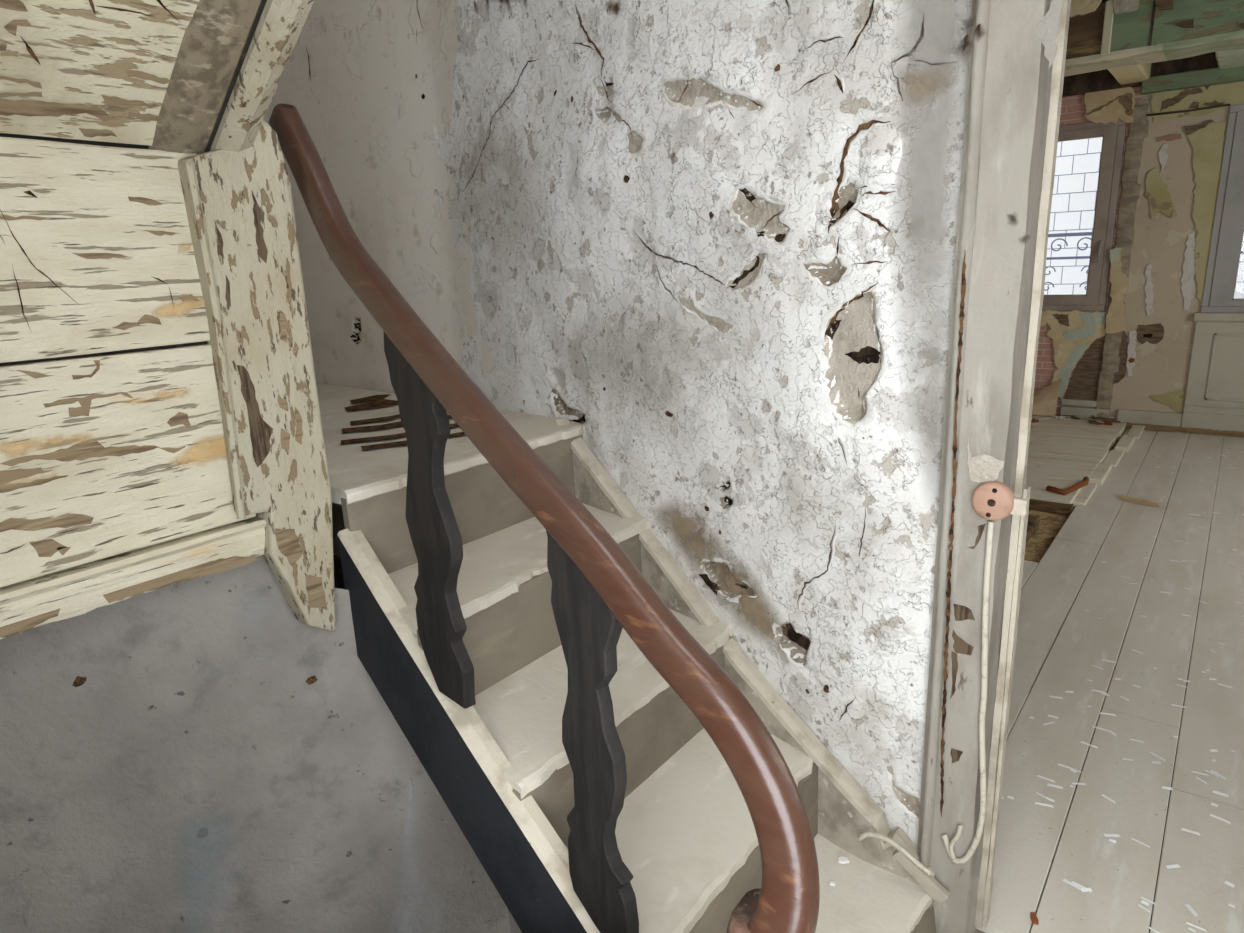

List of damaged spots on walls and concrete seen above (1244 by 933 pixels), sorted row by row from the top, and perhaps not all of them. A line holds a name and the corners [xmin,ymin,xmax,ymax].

crack [793,0,877,94]
peeling [0,76,161,138]
crack [828,13,954,255]
peeling [252,191,268,263]
crack [635,232,725,305]
flaking render [725,184,792,293]
flaking render [803,244,890,430]
peeling [1032,310,1164,416]
peeling [0,441,186,493]
peeling [0,513,94,557]
peeling [103,556,261,603]
flaking render [775,621,813,668]